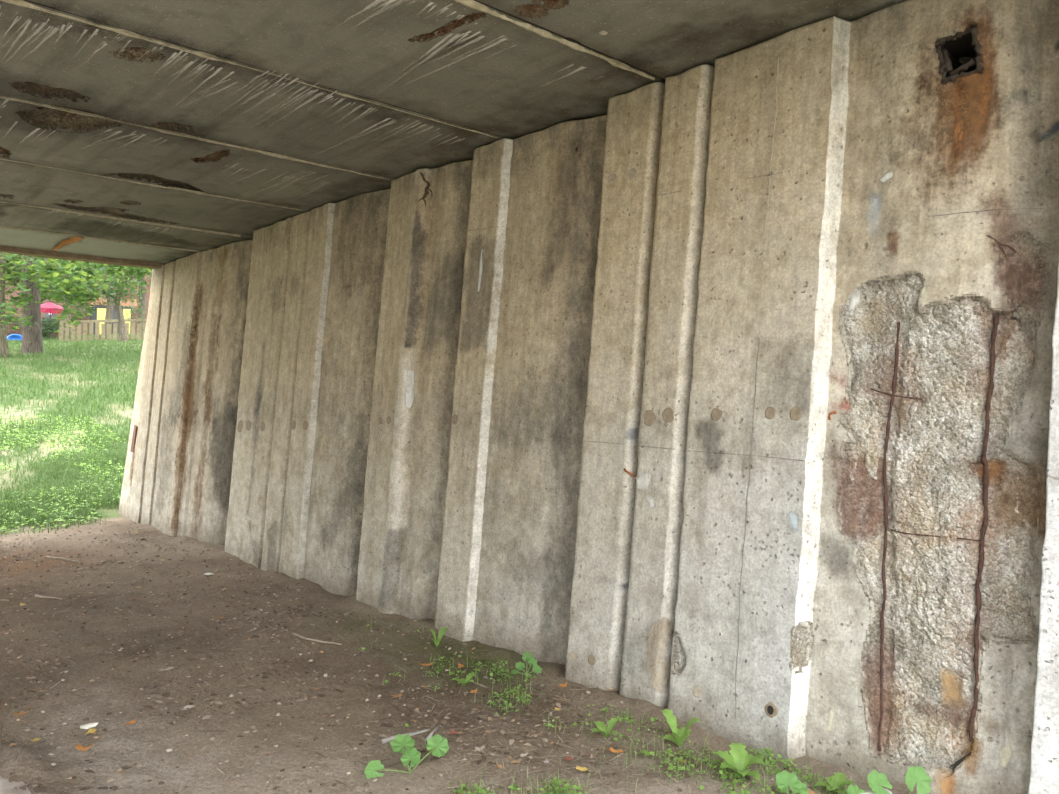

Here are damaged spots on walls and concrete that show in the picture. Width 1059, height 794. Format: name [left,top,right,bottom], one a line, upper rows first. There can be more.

water stain [0,6,131,56]
water stain [426,23,516,60]
spalling [9,81,124,133]
water stain [144,46,465,143]
corrosion [938,12,997,169]
spalling [103,173,208,194]
crack [418,172,432,207]
corrosion [171,287,219,529]
water stain [212,408,237,507]
corrosion [833,450,884,538]
spalling [836,271,1043,774]
spalling [789,621,814,674]